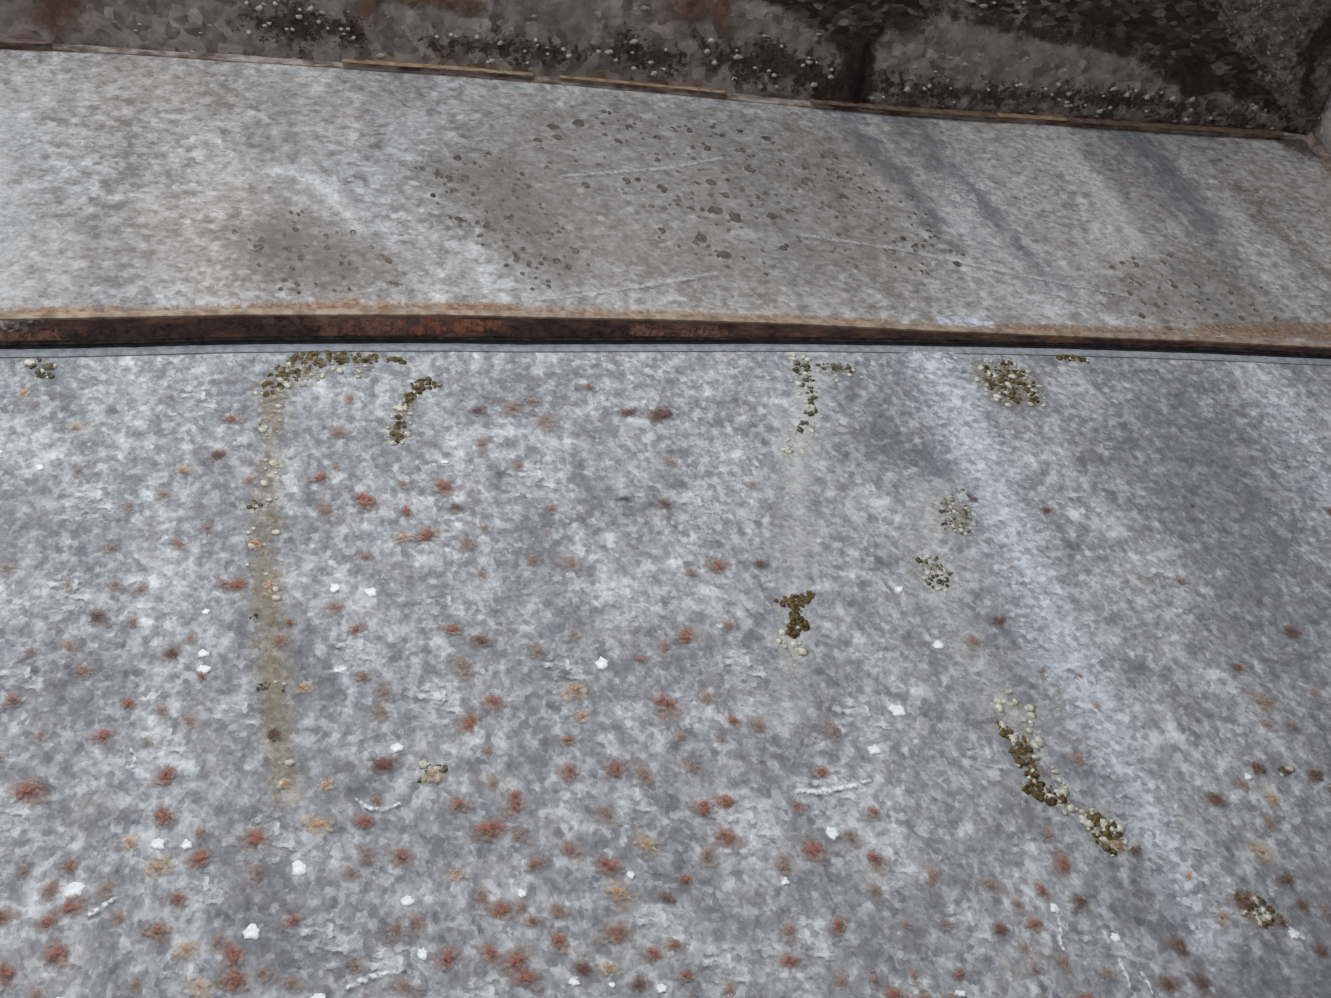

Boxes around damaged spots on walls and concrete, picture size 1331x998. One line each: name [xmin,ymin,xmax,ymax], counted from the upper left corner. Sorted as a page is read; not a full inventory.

damp [107,165,427,264]
rust [0,295,896,341]
rust [912,320,1331,341]
rust [621,406,674,420]
damp [715,364,836,744]
damp [417,683,459,724]
rust [457,693,508,733]
damp [907,351,1246,971]
rust [680,793,741,883]
rust [36,857,112,967]
rust [474,887,683,991]
rust [983,876,1046,974]